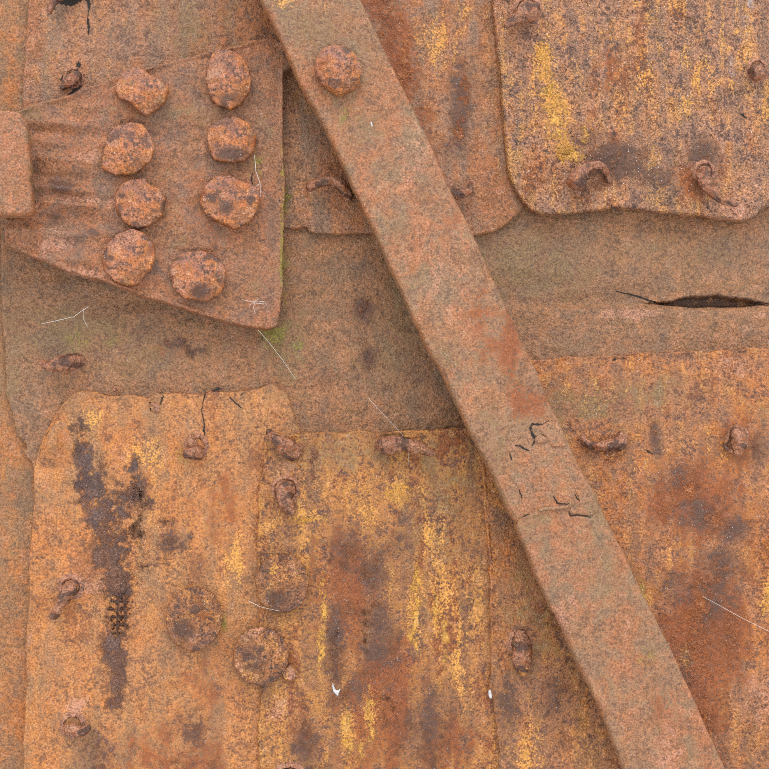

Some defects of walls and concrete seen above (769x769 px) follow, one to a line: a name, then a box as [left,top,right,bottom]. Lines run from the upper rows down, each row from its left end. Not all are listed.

rust [535,42,620,191]
peeling [531,422,566,447]
peeling [496,474,525,519]
rust [67,417,193,710]
rust [388,563,422,654]
rust [431,592,449,644]
rust [282,665,296,681]
rust [316,630,457,767]
rust [697,706,717,741]